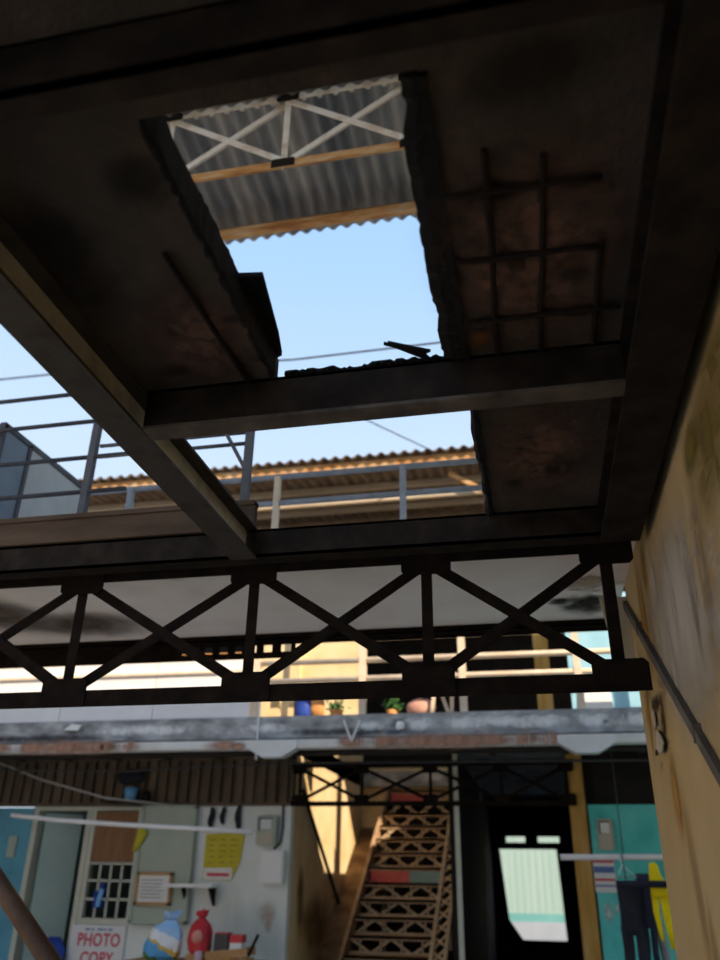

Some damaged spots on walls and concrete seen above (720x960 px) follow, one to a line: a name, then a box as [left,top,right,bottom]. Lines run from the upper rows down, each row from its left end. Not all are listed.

damp [551,595,601,612]
damp [102,725,185,736]
damp [246,723,285,733]
damp [302,721,383,735]
damp [404,713,609,730]
damp [622,713,644,726]
rust [21,742,135,753]